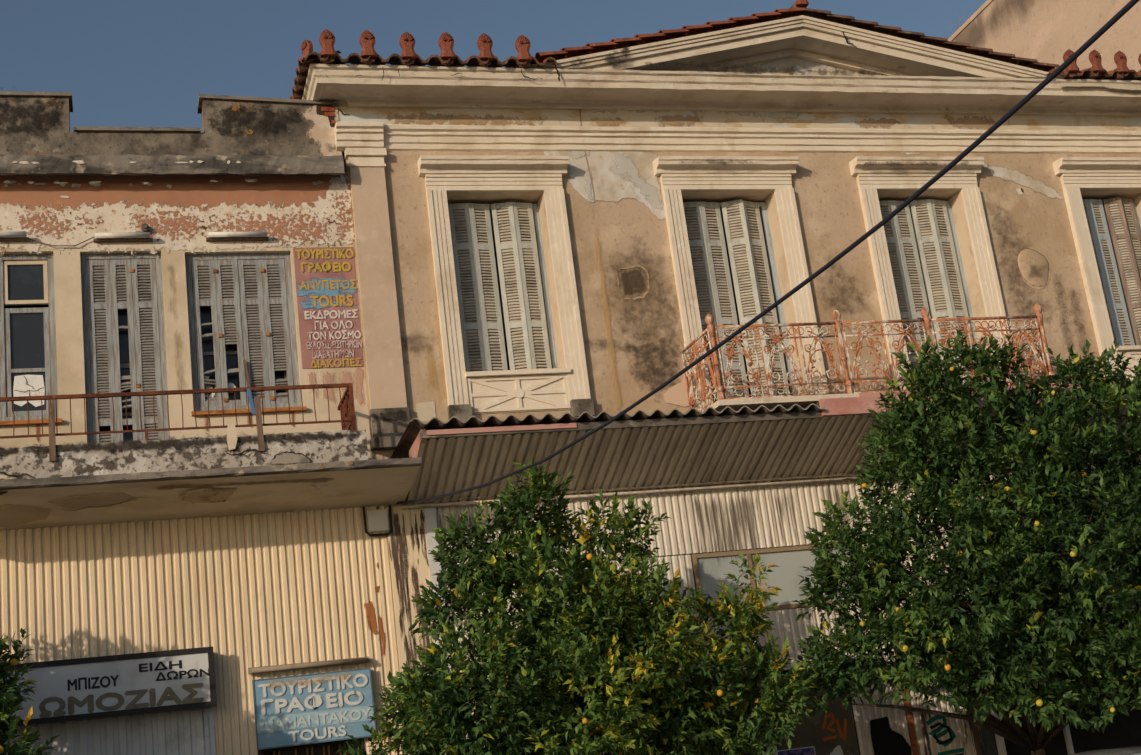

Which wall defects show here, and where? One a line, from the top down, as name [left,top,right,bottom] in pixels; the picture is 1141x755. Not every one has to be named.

water stain [0,97,63,135]
water stain [209,102,301,136]
flaking render [542,151,666,220]
flaking render [982,164,1064,199]
peeling [0,175,355,258]
water stain [620,260,662,302]